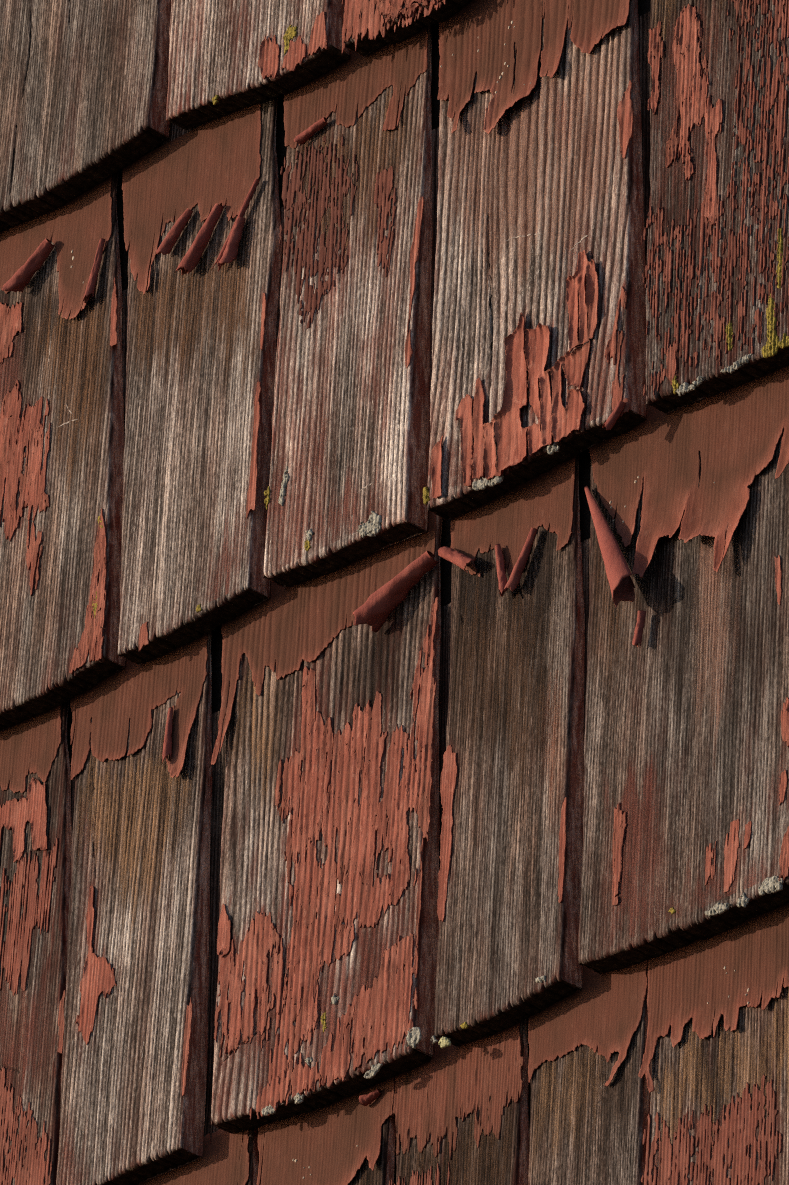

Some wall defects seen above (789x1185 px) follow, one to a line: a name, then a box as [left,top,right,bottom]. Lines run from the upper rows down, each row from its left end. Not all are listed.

peeling [258,11,328,80]
peeling [0,380,51,596]
peeling [69,509,107,674]
peeling [0,101,262,364]
peeling [246,382,261,519]
peeling [279,0,630,329]
peeling [455,250,599,487]
peeling [584,0,789,607]
peeling [0,622,208,996]
peeling [137,456,789,1185]
peeling [0,1065,52,1185]